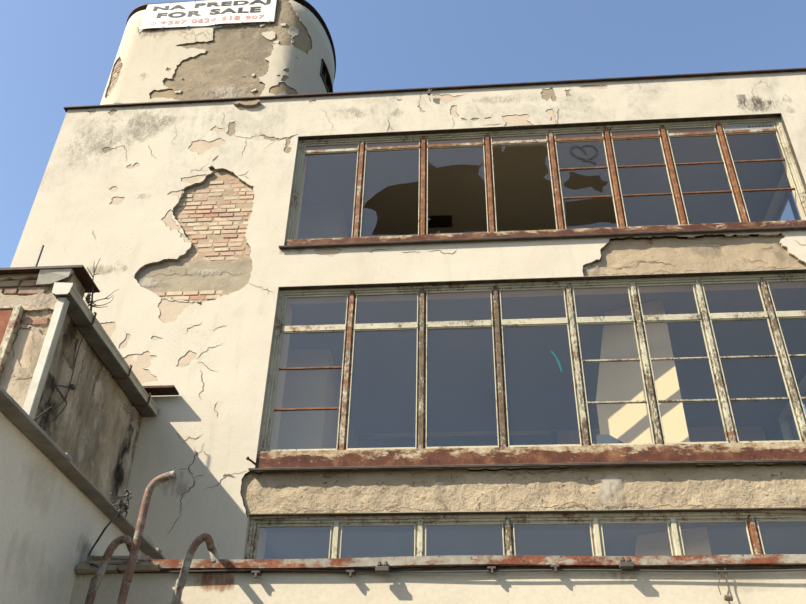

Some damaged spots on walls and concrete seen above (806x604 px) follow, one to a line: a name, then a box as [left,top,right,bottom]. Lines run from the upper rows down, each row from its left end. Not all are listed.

flaking render [149,0,313,101]
peeling [433,94,491,121]
peeling [502,114,533,127]
flaking render [134,166,255,323]
flaking render [582,233,806,276]
peeling [100,322,116,338]
peeling [118,334,157,383]
crack [186,324,224,418]
water stain [39,375,56,437]
water stain [113,425,133,494]
crack [162,434,239,534]
corrosion [202,574,233,589]